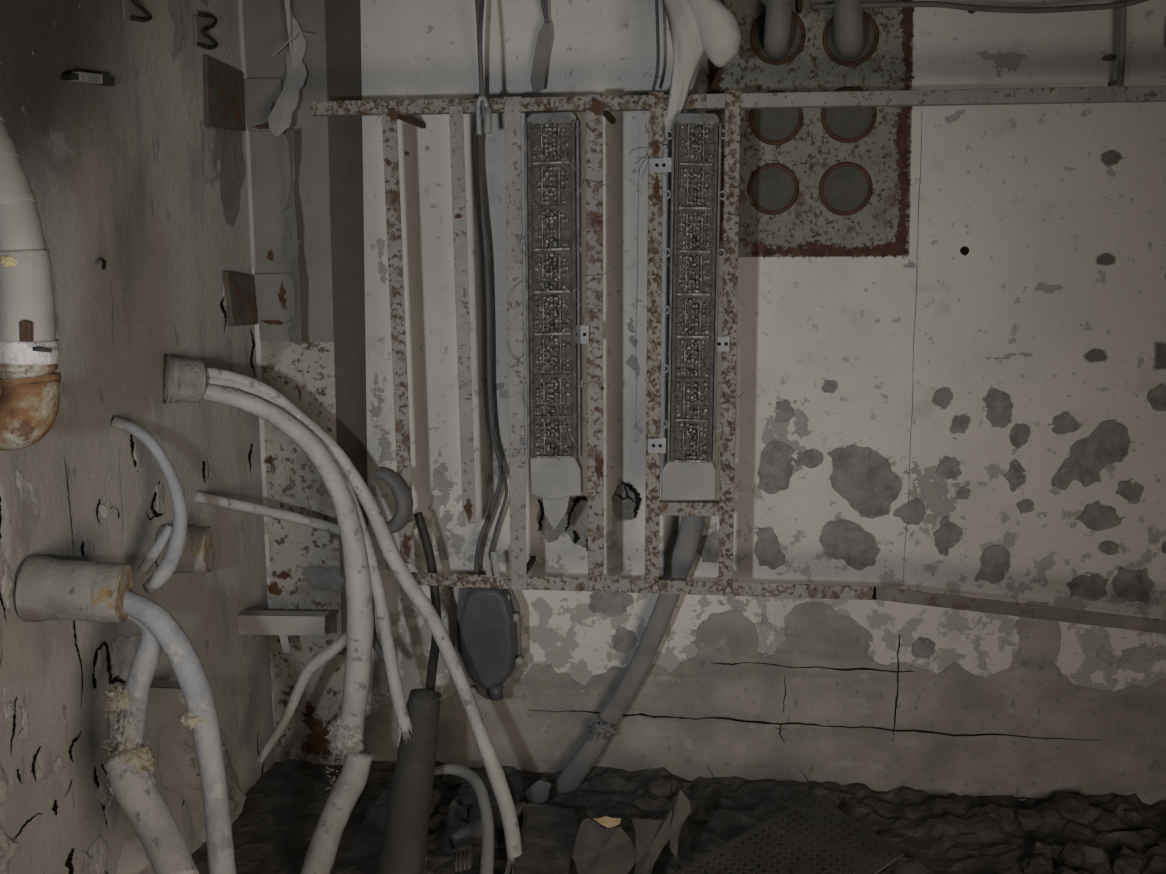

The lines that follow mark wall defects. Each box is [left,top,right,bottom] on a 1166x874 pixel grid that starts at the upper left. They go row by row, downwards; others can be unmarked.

rust [705,60,724,94]
rust [898,0,915,90]
rust [751,106,912,259]
crack [0,435,166,623]
spalling [754,439,926,570]
spalling [933,388,1034,514]
spalling [1049,412,1134,490]
spalling [1075,479,1144,555]
crack [1,621,140,874]
rust [302,702,337,764]
peeling [435,592,1166,805]
crack [531,634,1093,743]